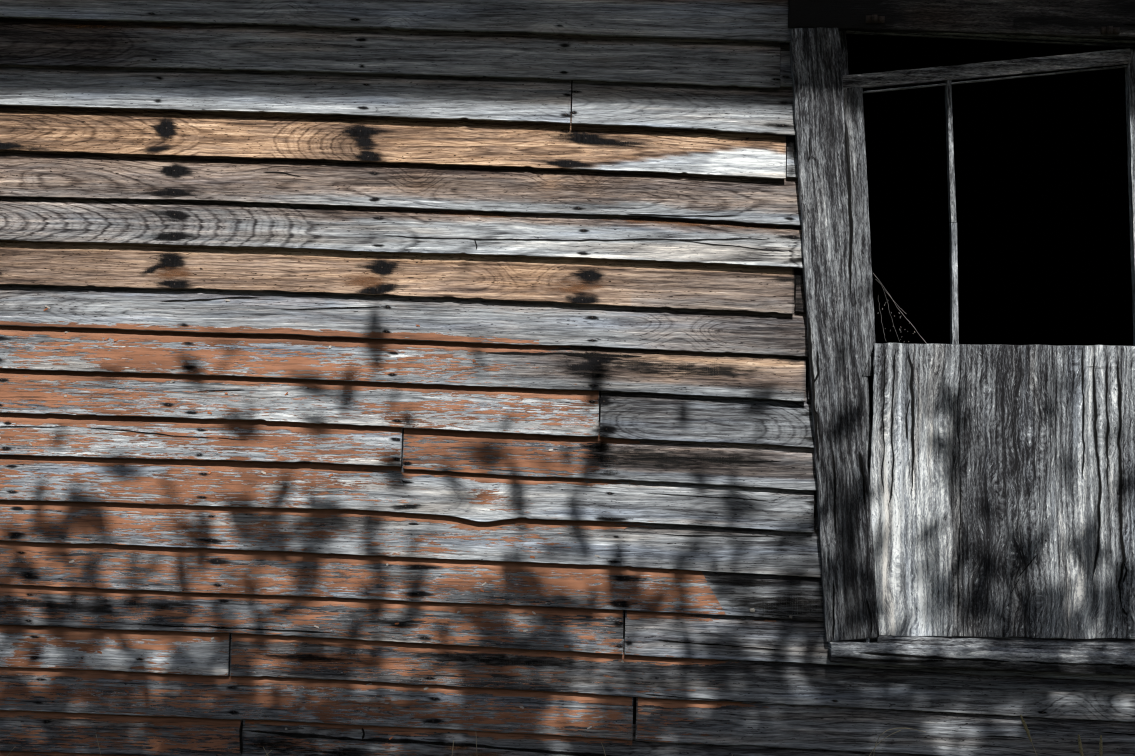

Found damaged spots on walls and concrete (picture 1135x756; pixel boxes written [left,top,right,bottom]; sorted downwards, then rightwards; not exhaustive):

peeling [0,305,776,756]
water stain [565,357,753,378]
crack [955,365,963,611]
crack [832,580,1135,670]
crack [1082,351,1135,615]